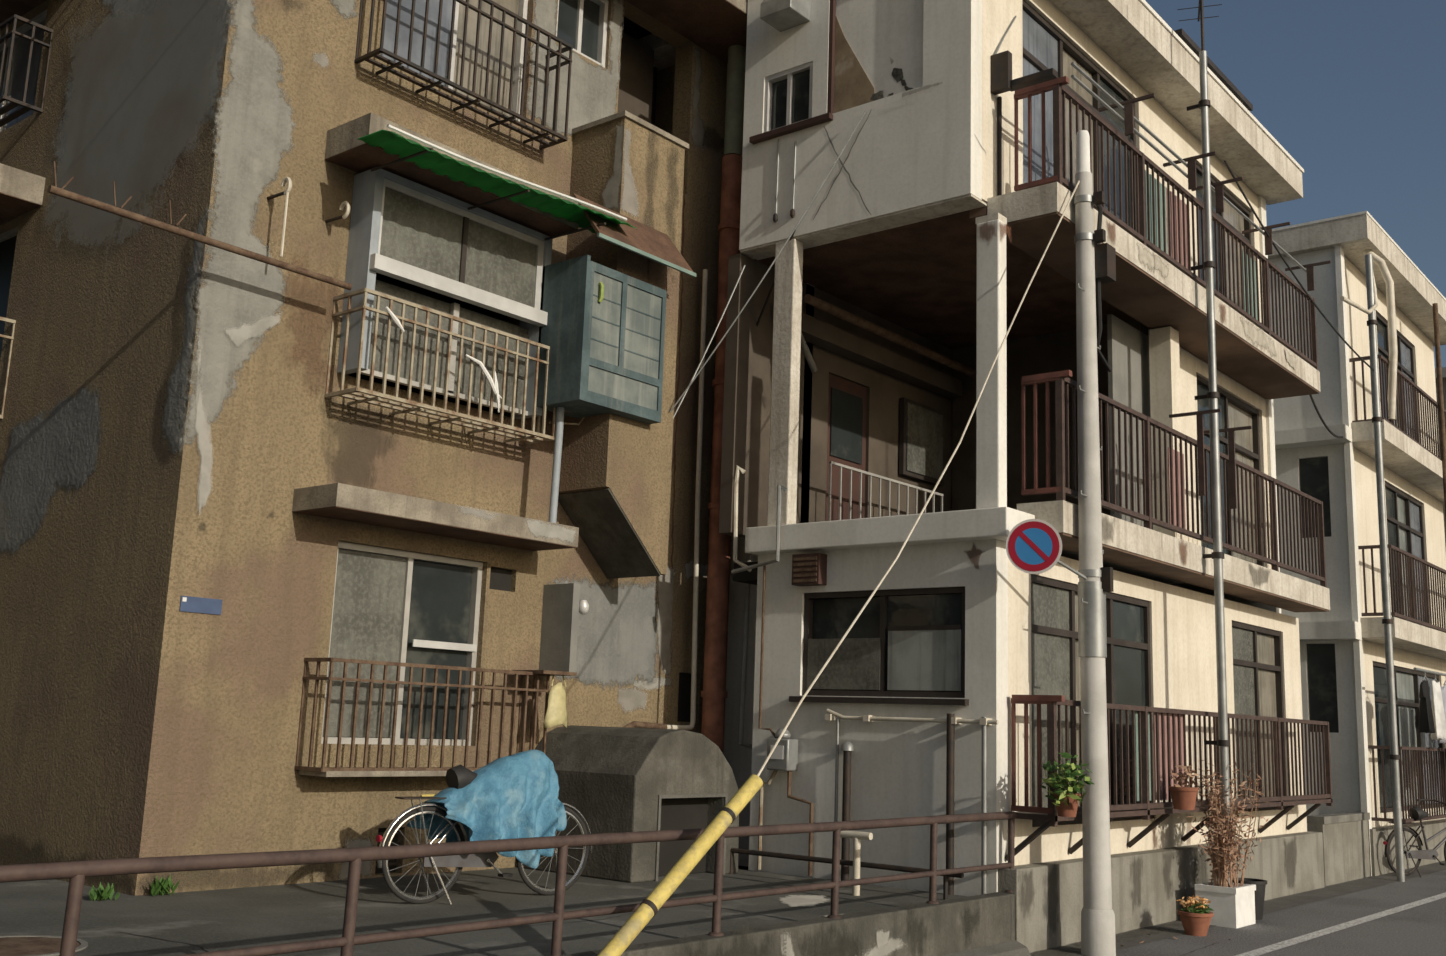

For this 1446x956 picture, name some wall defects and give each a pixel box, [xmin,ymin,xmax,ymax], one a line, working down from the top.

peeling [46,0,236,246]
leakage [602,125,638,216]
peeling [225,314,280,347]